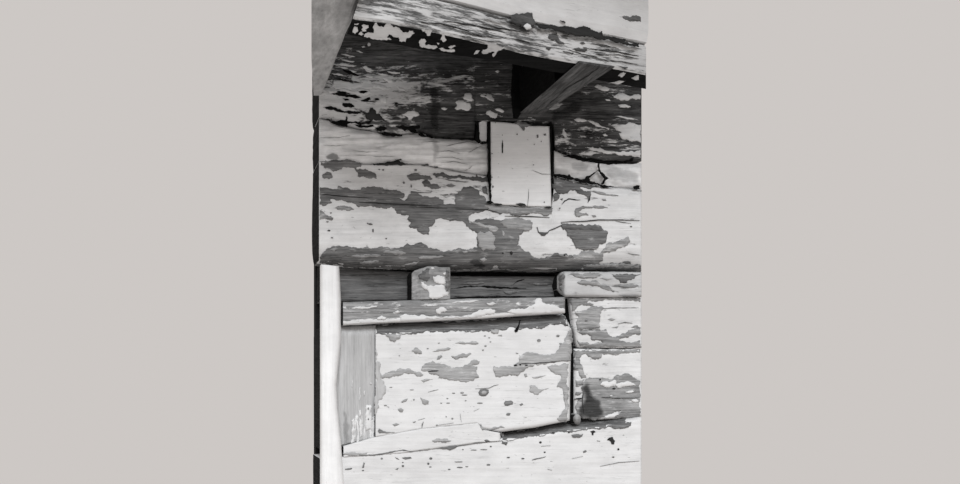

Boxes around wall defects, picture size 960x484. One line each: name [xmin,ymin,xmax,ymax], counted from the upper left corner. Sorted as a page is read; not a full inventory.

peeling [421,29,455,52]
peeling [485,12,639,54]
peeling [323,88,387,103]
peeling [403,95,421,120]
peeling [594,66,639,101]
peeling [320,159,641,470]